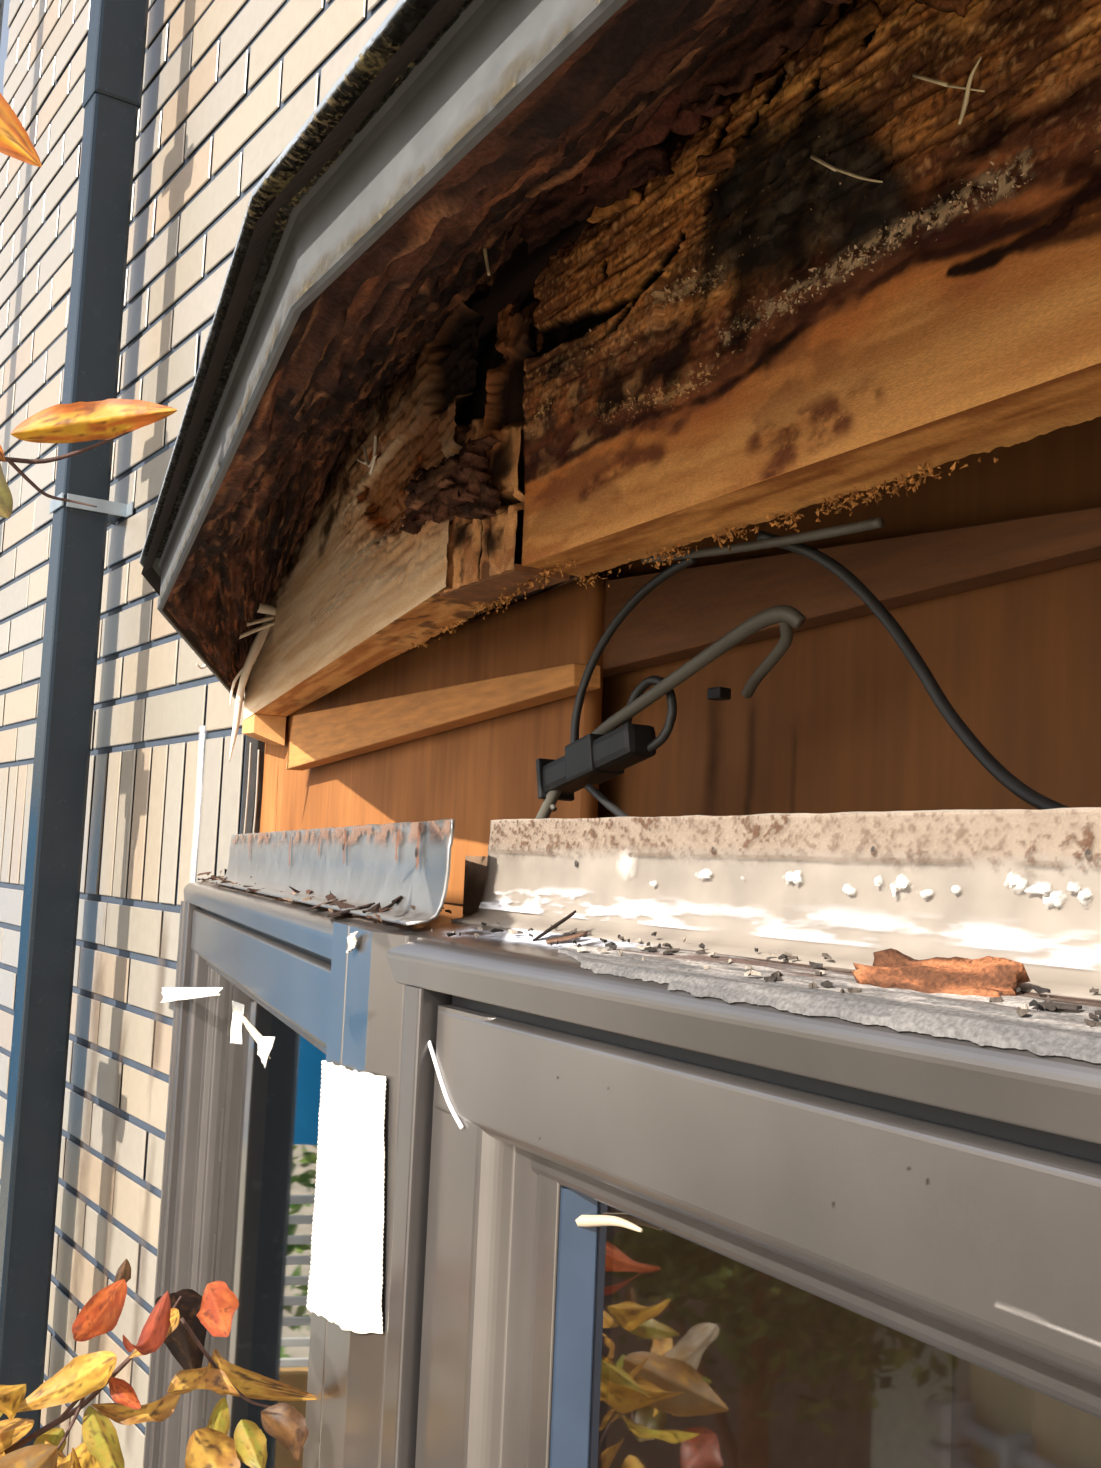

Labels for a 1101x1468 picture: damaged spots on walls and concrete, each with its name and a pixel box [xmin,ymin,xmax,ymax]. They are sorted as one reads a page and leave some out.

peeling [915,0,971,18]
peeling [805,0,883,69]
peeling [587,187,642,224]
water stain [489,103,1101,486]
peeling [357,453,423,537]
water stain [454,526,466,545]
water stain [485,530,496,554]
corrosion [232,820,450,868]
peeling [785,871,800,884]
peeling [874,875,931,897]
peeling [1004,873,1090,906]
peeling [533,910,588,944]